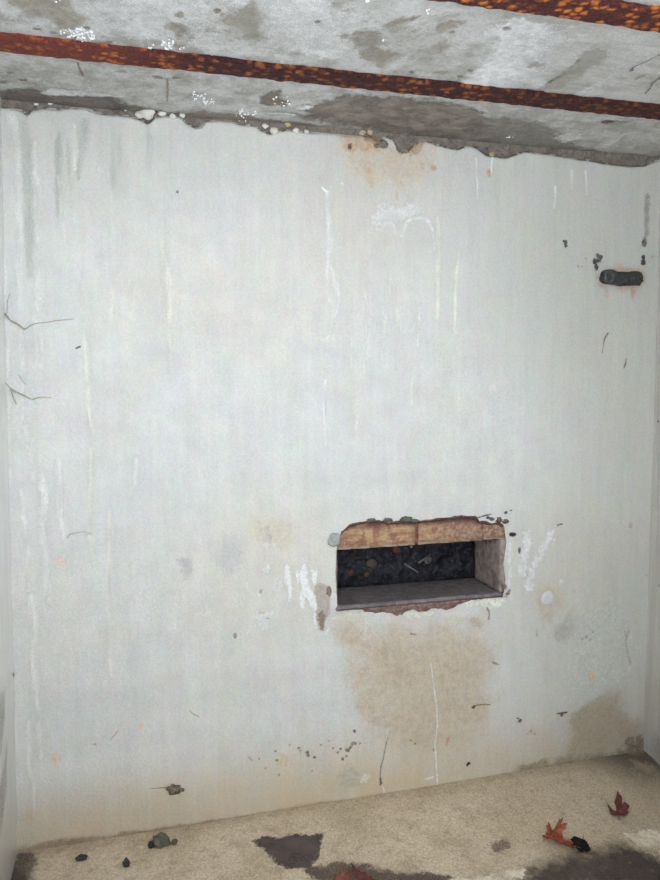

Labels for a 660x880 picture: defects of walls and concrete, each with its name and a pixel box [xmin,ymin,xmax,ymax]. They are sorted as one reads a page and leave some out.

water stain [336,16,422,69]
water stain [424,19,467,54]
water stain [0,72,606,245]
water stain [4,112,66,810]
peeling [284,530,555,635]
flaking render [340,515,509,537]
water stain [13,605,526,880]
water stain [519,591,660,770]